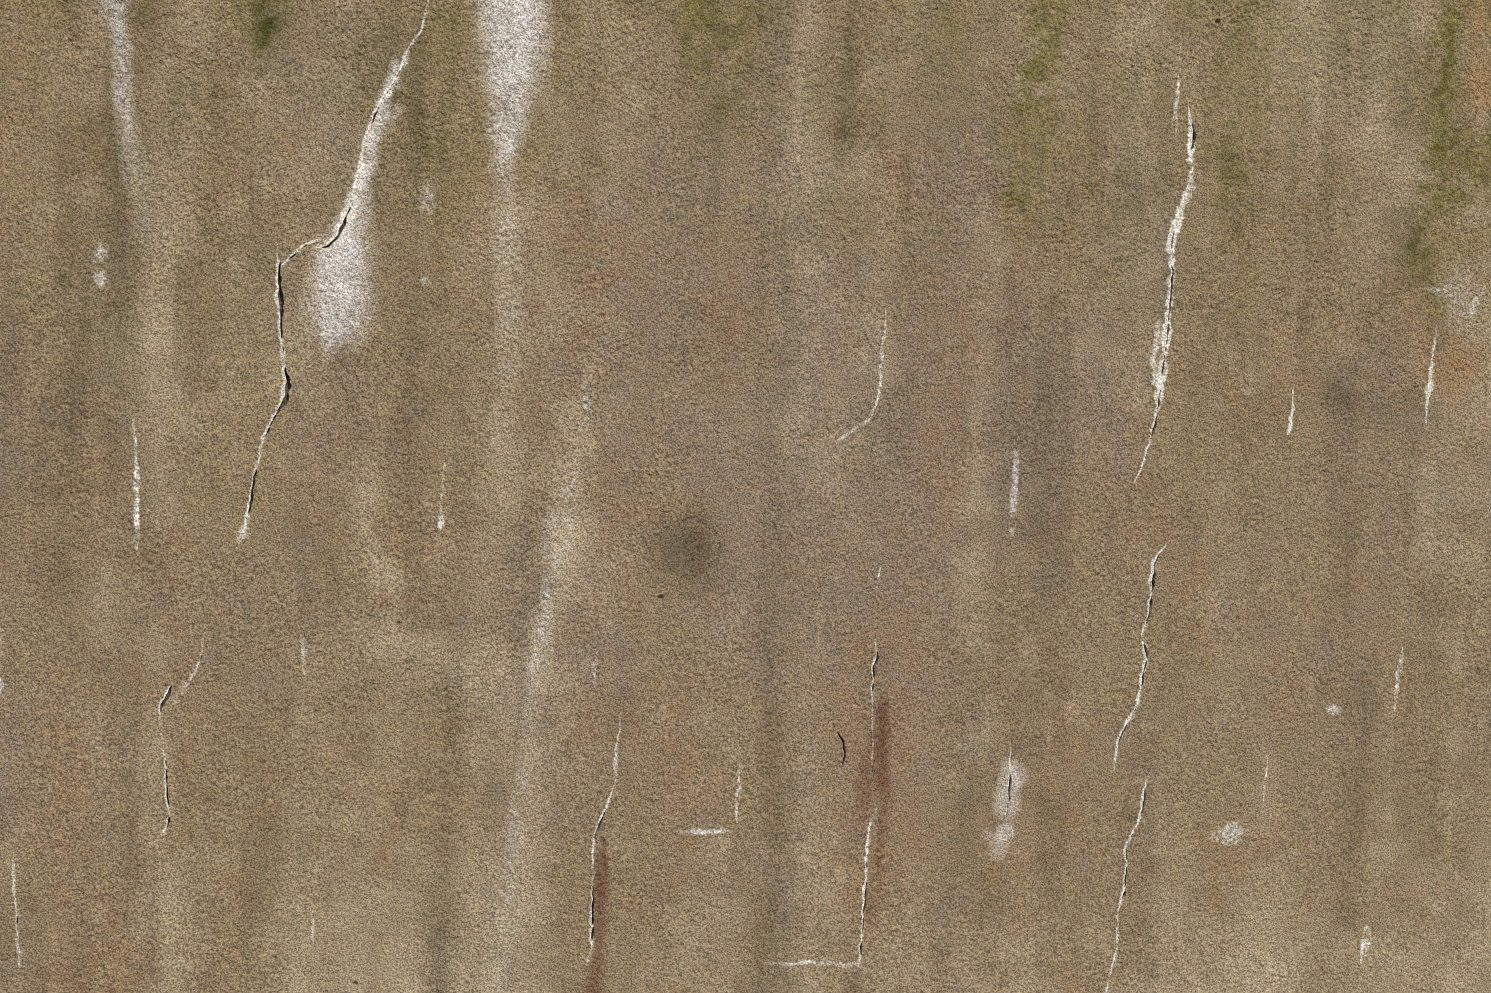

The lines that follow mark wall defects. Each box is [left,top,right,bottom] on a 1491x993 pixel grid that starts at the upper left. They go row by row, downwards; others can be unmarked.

damp [0,0,304,402]
crack [234,0,431,545]
damp [297,51,406,366]
damp [468,0,556,529]
damp [585,0,813,153]
crack [1131,46,1199,487]
crack [147,631,208,849]
crack [585,649,625,963]
crack [762,807,878,970]
crack [825,637,881,768]
corrosion [838,687,897,993]
crack [1104,540,1171,993]